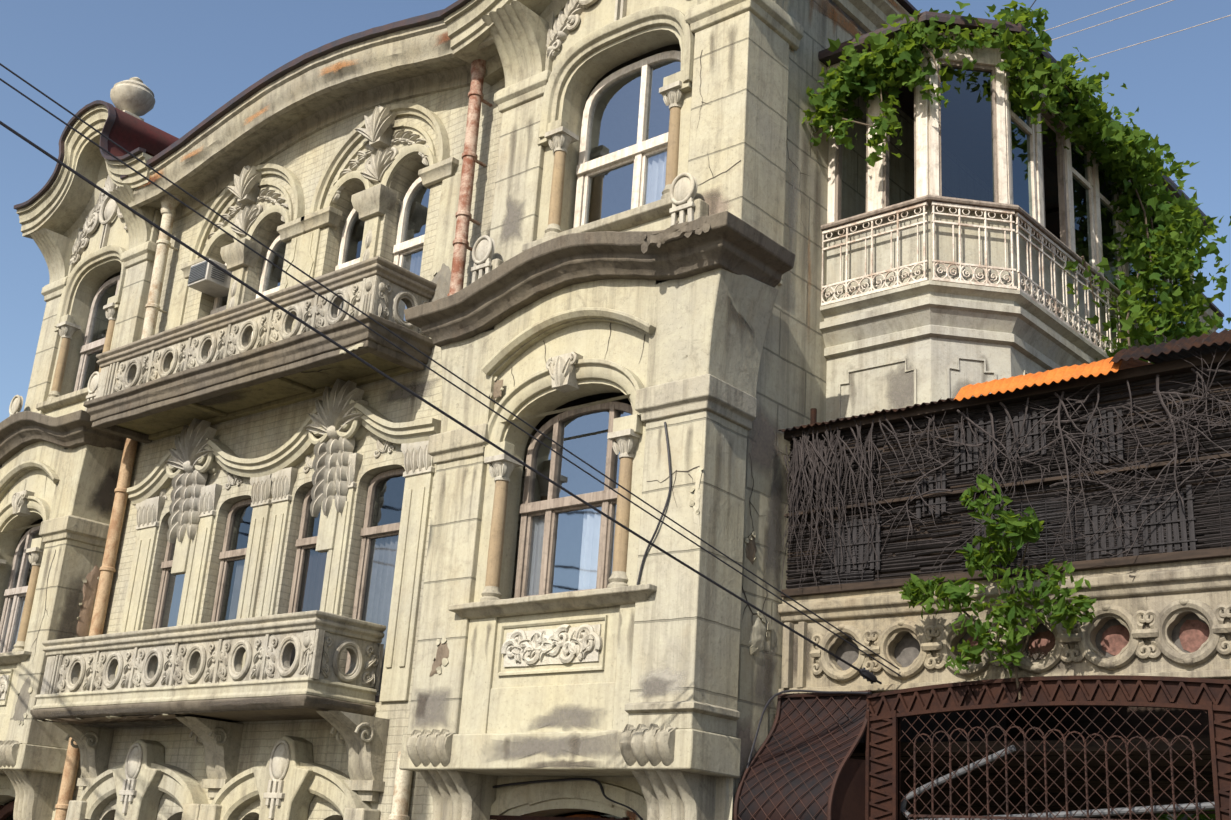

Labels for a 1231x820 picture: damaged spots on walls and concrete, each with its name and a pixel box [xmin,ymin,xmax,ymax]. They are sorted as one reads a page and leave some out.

crack [697,51,741,185]
water stain [92,469,118,513]
water stain [751,416,781,574]
water stain [57,587,81,639]
water stain [498,708,610,768]